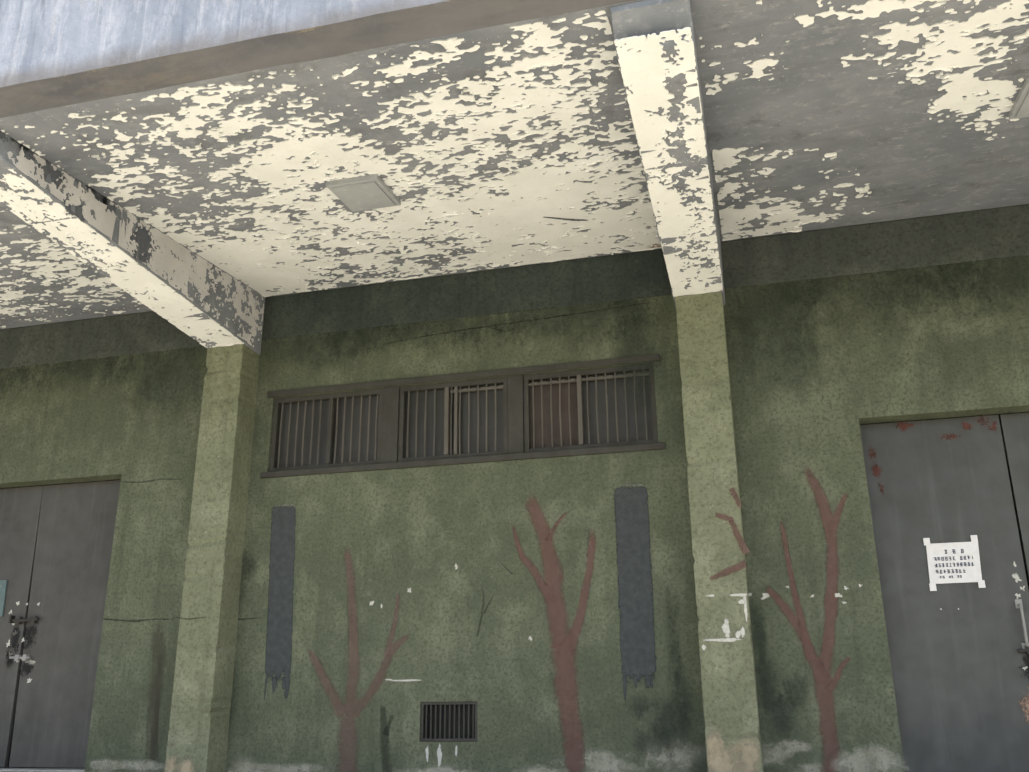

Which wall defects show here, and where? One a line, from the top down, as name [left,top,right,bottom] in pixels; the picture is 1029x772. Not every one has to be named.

peeling [794,0,1029,141]
peeling [0,10,875,347]
crack [104,615,205,623]